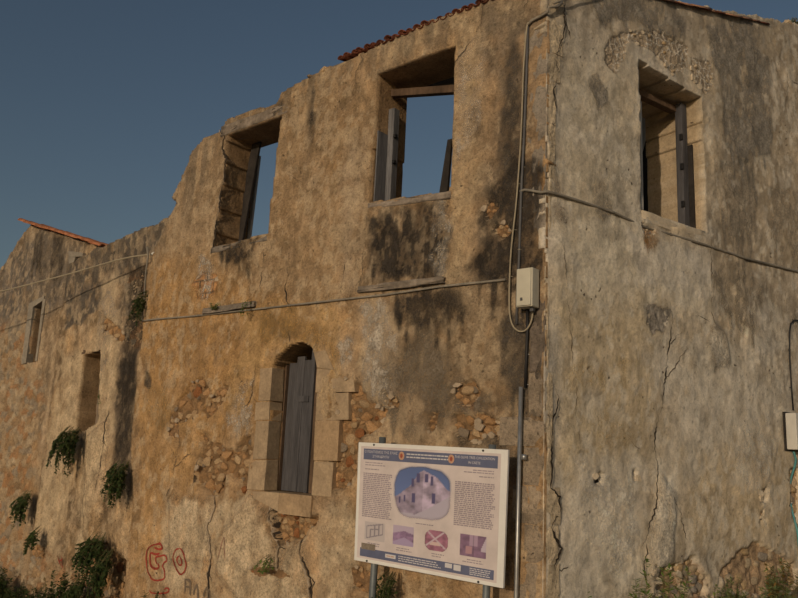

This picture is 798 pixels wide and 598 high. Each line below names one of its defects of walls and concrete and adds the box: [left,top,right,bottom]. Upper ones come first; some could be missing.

flaking render [604,29,714,93]
damp [113,265,151,469]
crack [173,430,198,501]
flaking render [194,435,253,496]
flaking render [332,385,400,489]
damp [361,204,497,440]
flaking render [450,381,500,445]
crack [550,305,580,596]
crack [629,309,698,579]
crack [205,495,216,598]
crack [267,507,315,598]
flaking render [719,542,795,595]